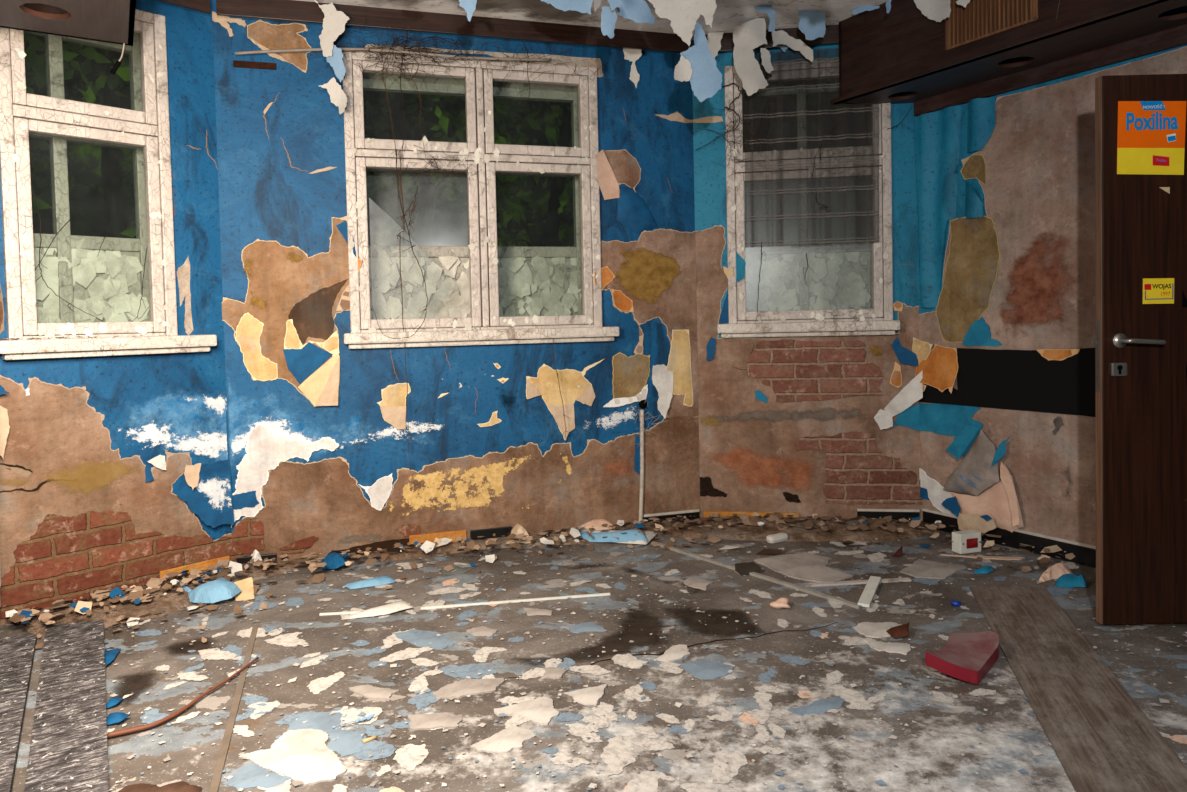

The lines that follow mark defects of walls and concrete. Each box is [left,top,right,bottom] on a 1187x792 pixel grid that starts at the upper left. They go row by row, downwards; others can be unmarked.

peeling [459,0,477,22]
peeling [851,0,891,15]
peeling [914,0,970,22]
peeling [541,0,826,115]
flaking render [0,44,1187,625]
crack [0,463,57,492]